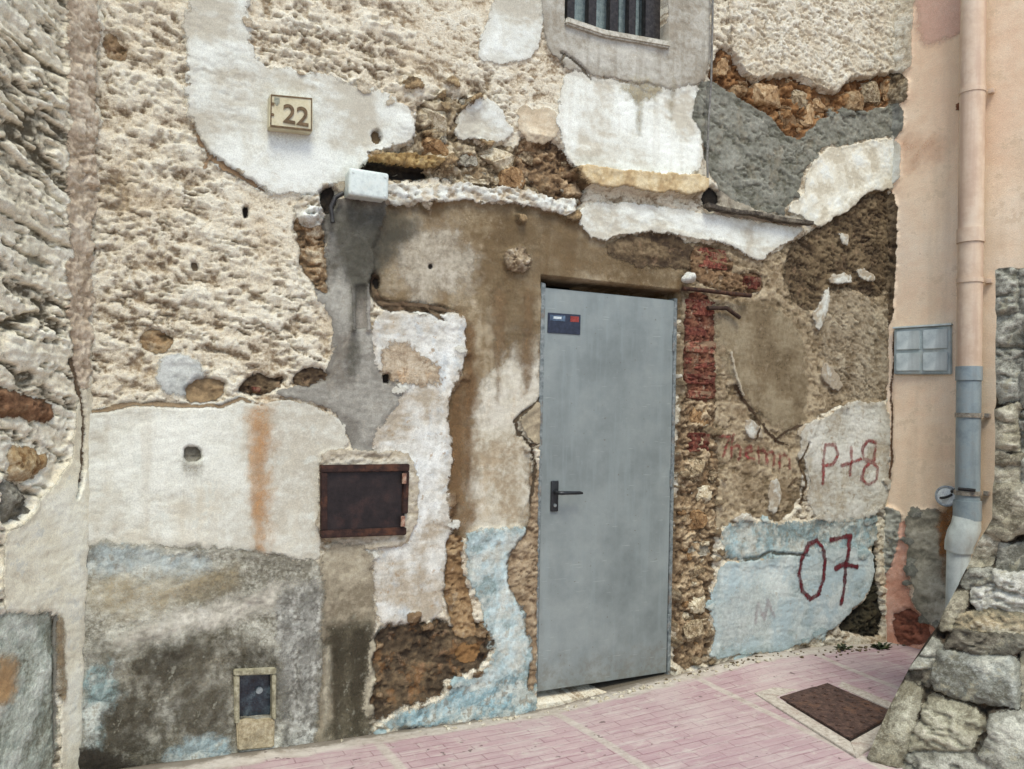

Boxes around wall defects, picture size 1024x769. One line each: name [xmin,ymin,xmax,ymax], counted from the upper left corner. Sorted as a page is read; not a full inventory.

flaking render [708,48,891,140]
water stain [325,200,654,388]
flaking render [0,445,48,523]
flaking render [0,387,54,423]
crack [68,358,259,483]
water stain [449,326,478,530]
spalling [361,75,939,734]
crack [730,351,809,505]
crack [743,551,808,561]
water stain [78,539,377,769]